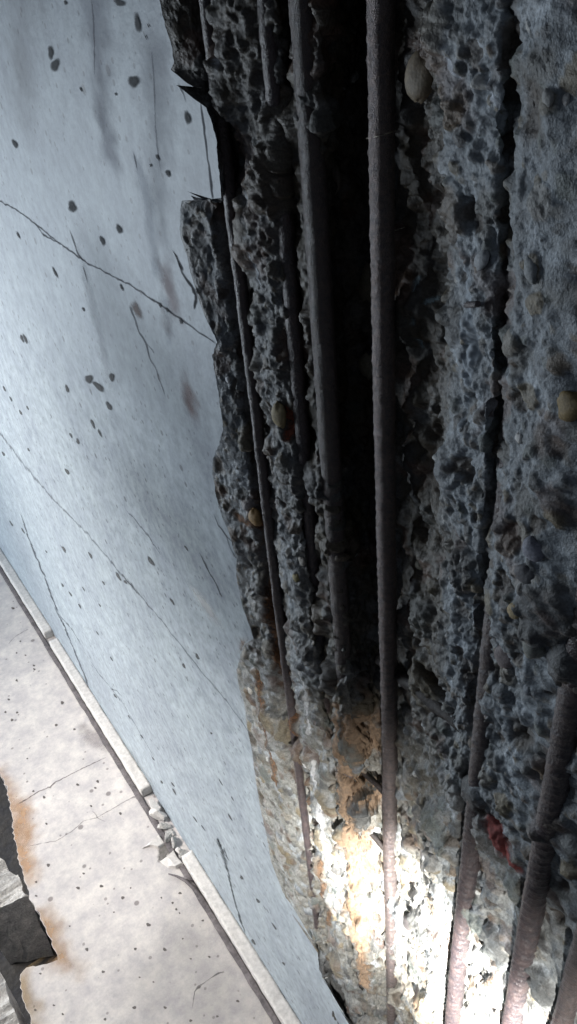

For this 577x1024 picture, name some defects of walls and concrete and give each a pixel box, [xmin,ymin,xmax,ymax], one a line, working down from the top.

crack [0,201,213,395]
spalling [159,0,577,1024]
crack [21,516,87,683]
rust [263,579,291,676]
rust [256,669,264,712]
rust [263,726,278,786]
spalling [142,835,183,869]
crack [217,839,245,932]
rust [317,859,327,898]
rust [332,702,382,990]